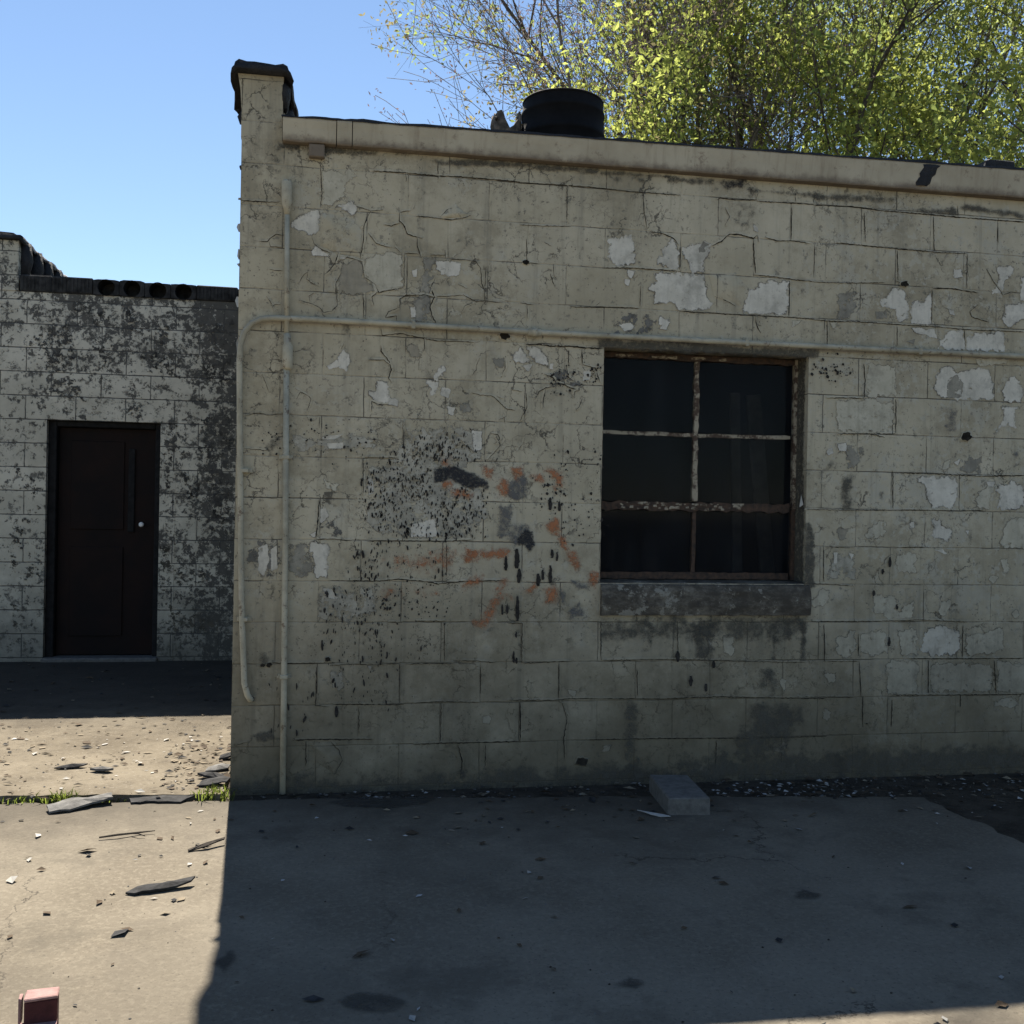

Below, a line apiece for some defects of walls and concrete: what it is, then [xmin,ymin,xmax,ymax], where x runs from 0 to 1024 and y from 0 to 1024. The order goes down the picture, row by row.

crack [238,196,279,204]
peeling [290,169,358,257]
crack [259,163,683,460]
peeling [614,238,713,334]
peeling [742,279,790,315]
peeling [876,265,1024,353]
peeling [327,349,352,371]
peeling [933,365,1024,432]
peeling [247,366,498,711]
peeling [917,456,1024,574]
damp [601,615,806,688]
peeling [835,594,1024,708]